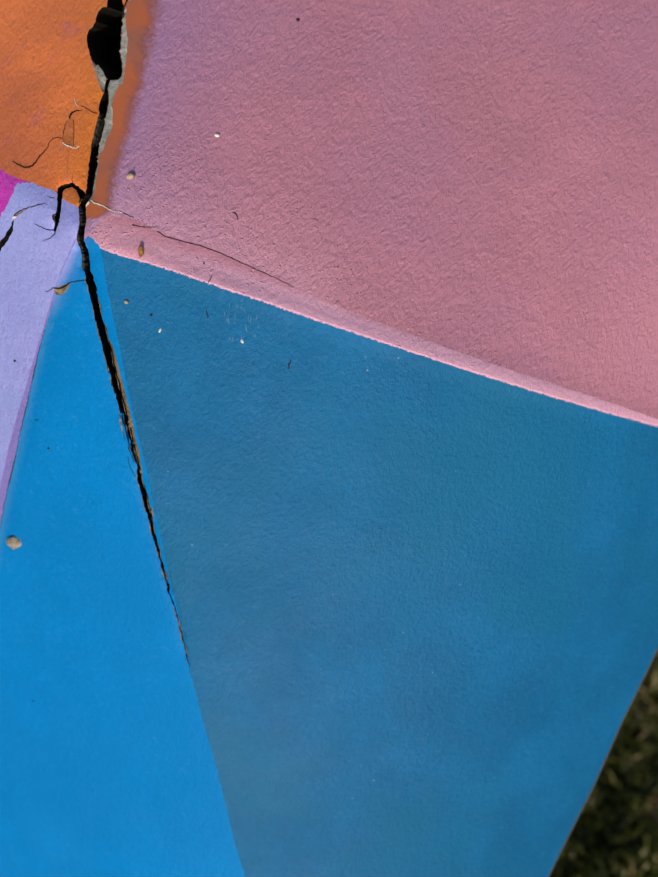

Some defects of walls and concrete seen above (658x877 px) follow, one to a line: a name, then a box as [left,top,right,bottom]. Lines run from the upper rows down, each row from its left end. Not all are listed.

peeling [91,58,106,92]
crack [0,0,292,668]